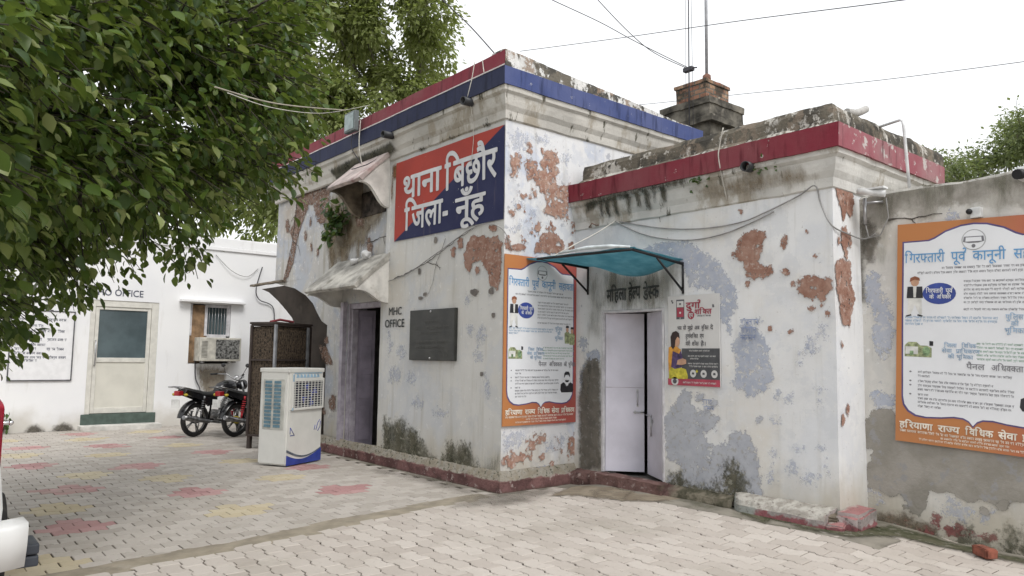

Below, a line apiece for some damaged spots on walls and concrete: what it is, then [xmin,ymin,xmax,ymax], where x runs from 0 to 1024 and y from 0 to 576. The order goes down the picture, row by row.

peeling [283,188,330,280]
peeling [450,142,575,296]
peeling [643,188,896,401]
leakage [383,419,478,468]
peeling [501,431,575,469]
leakage [579,354,601,470]
peeling [664,389,762,495]
leakage [878,513,936,536]
leakage [954,526,1024,556]